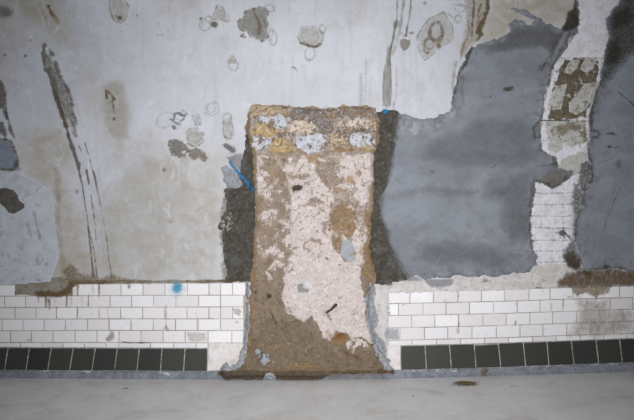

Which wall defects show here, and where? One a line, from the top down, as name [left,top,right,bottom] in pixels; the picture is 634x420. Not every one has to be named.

leakage [497,0,580,56]
leakage [604,0,634,78]
leakage [41,43,81,140]
peeling [0,138,60,286]
peeling [256,155,297,283]
peeling [330,181,370,252]
leakage [369,0,444,285]
peeling [374,0,619,358]
peeling [346,338,368,353]